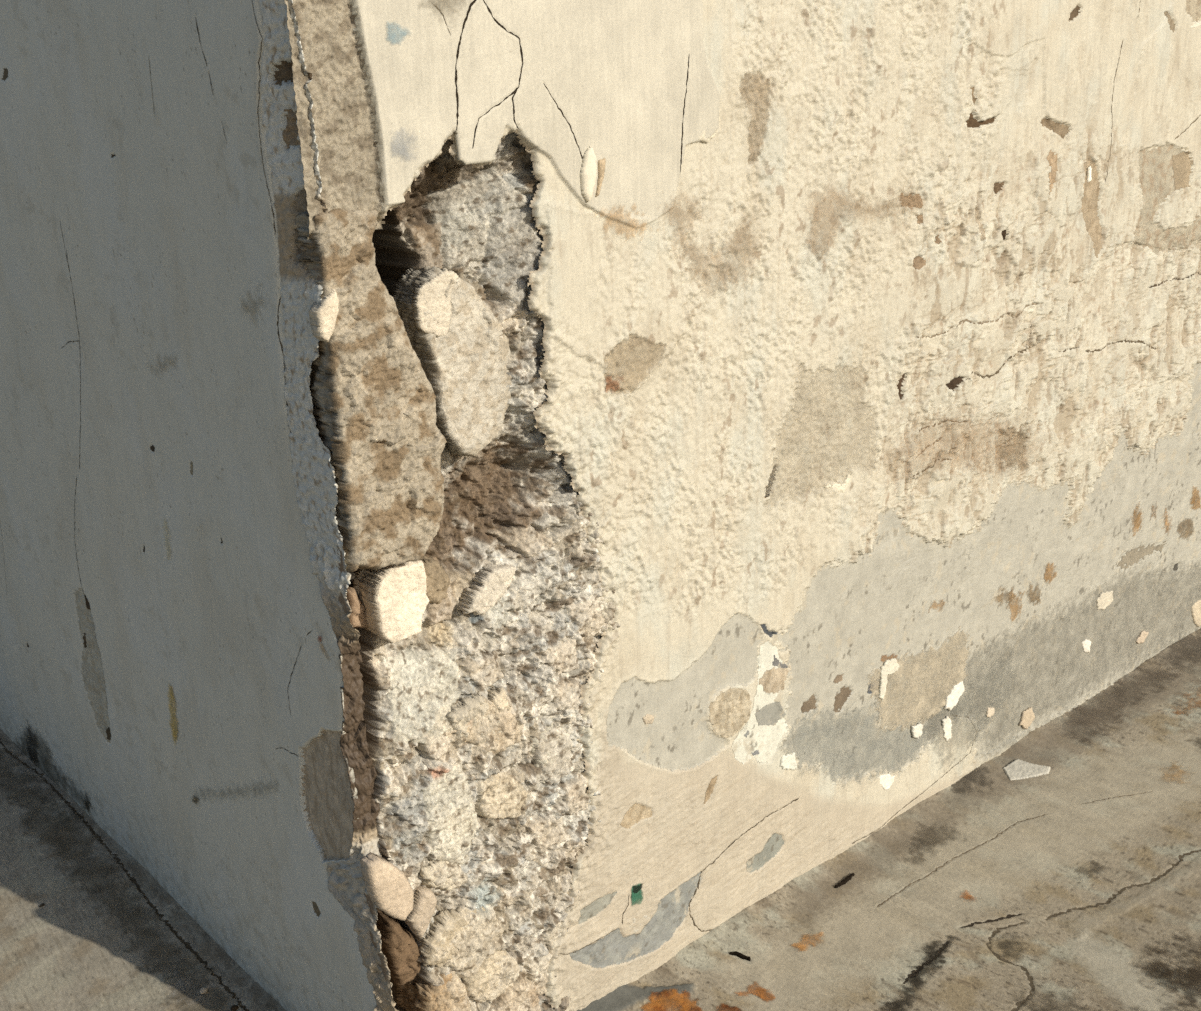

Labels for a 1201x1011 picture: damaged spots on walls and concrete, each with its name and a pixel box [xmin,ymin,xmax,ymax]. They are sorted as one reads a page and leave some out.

crack [432,0,583,159]
crack [680,61,689,172]
flaking render [273,0,1201,1011]
peeling [74,588,111,743]
water stain [21,729,91,811]
crack [852,715,977,844]
crack [877,814,1045,907]
rust [642,989,702,1011]
rust [718,983,775,1011]
water stain [881,935,958,1011]
crack [903,850,1201,1011]
water stain [1156,936,1201,1009]